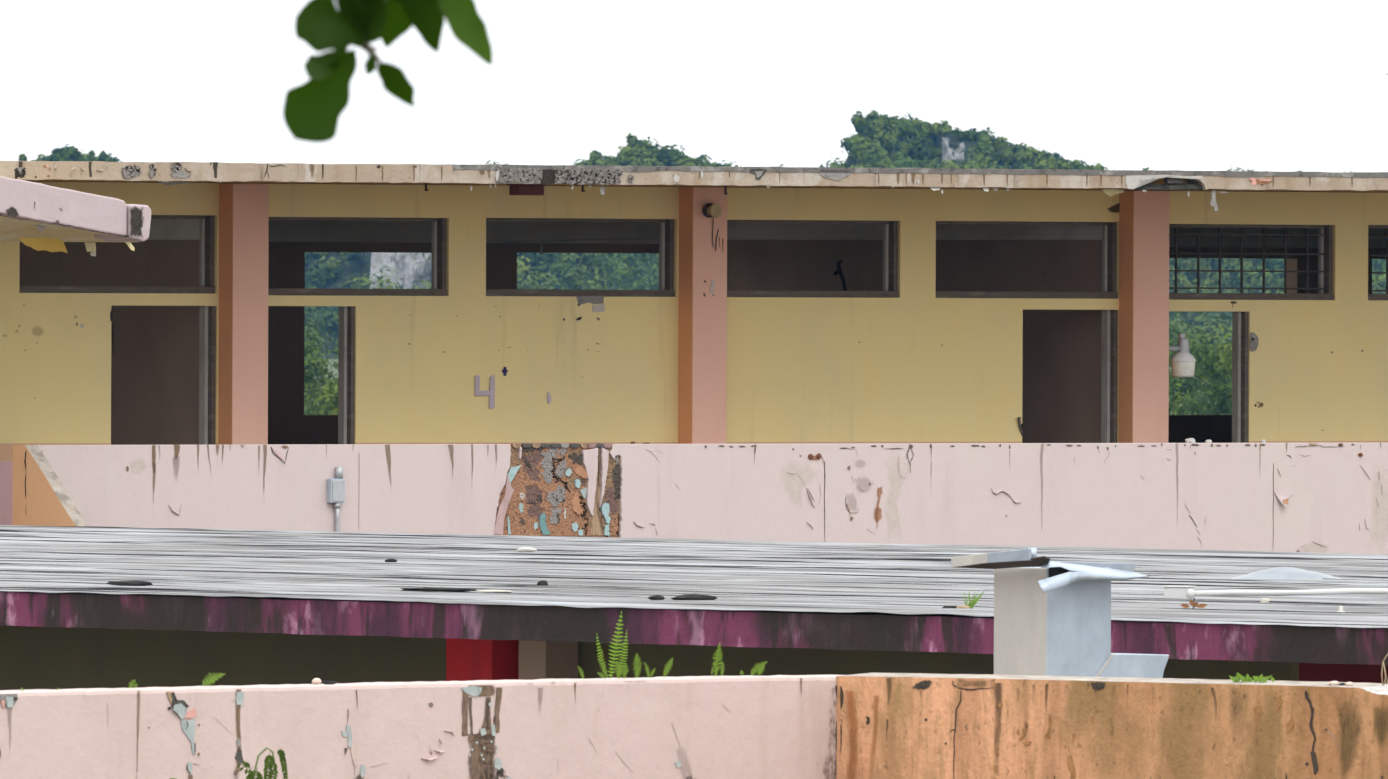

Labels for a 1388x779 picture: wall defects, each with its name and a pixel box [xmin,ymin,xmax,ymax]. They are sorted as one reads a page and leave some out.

spalling [490,167,634,195]
water stain [258,445,267,486]
spalling [494,443,657,536]
peeling [166,692,200,779]
peeling [469,724,512,779]
water stain [993,683,1002,779]
water stain [1376,713,1386,739]